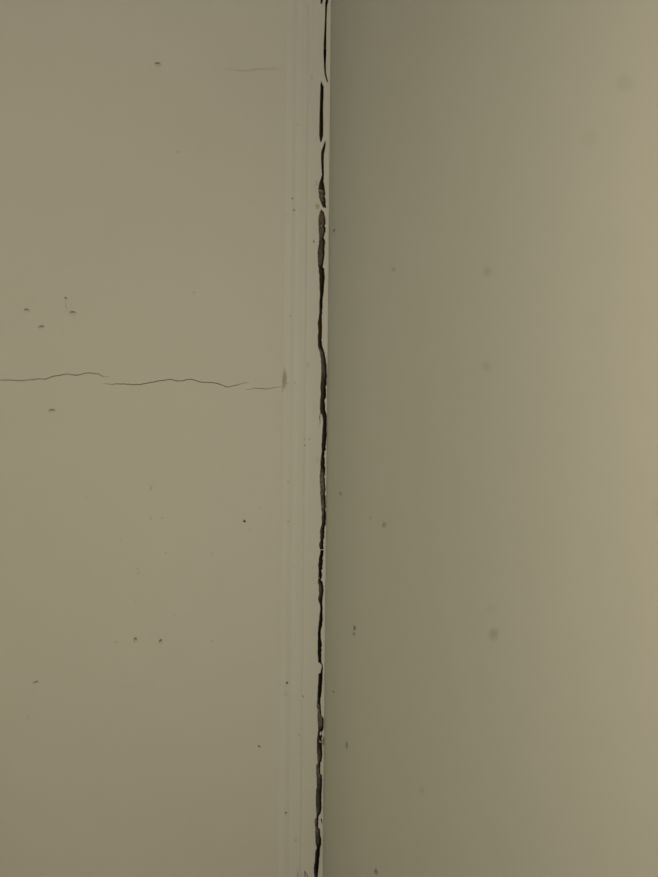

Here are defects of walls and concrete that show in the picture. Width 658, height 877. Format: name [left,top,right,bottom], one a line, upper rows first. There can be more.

crack [0,372,275,390]
crack [314,0,328,877]